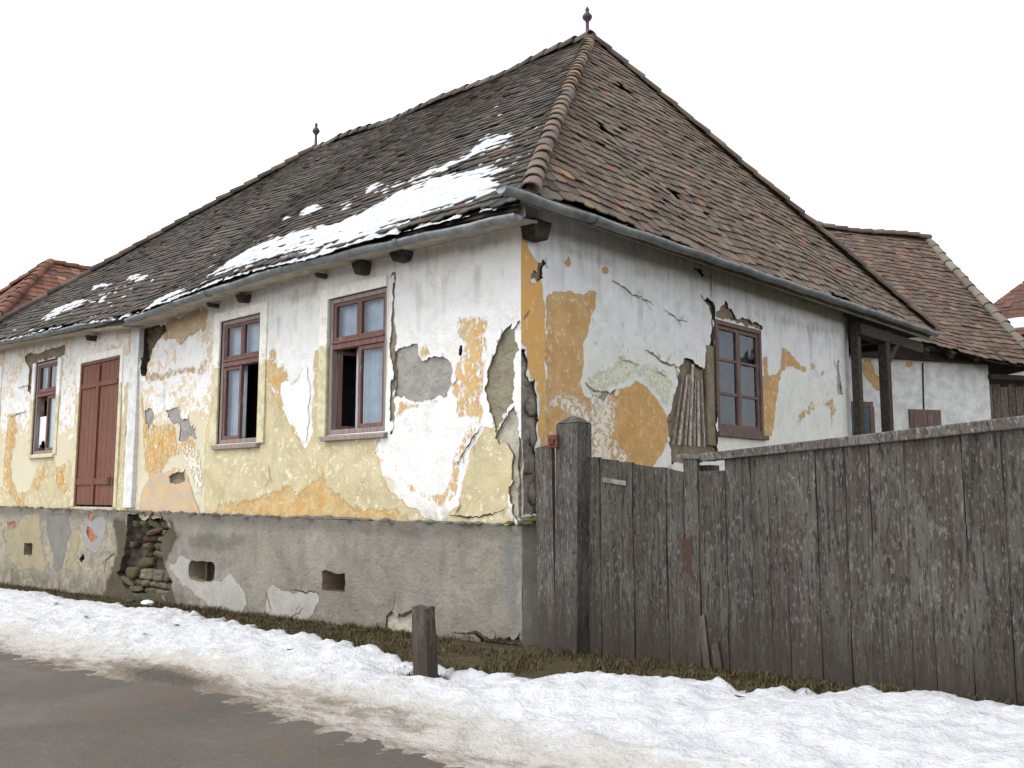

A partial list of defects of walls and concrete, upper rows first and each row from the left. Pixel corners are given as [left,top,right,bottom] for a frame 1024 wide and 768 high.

crack [614,281,688,326]
flaking render [25,345,65,394]
peeling [86,235,763,601]
peeling [763,348,843,436]
peeling [0,413,74,572]